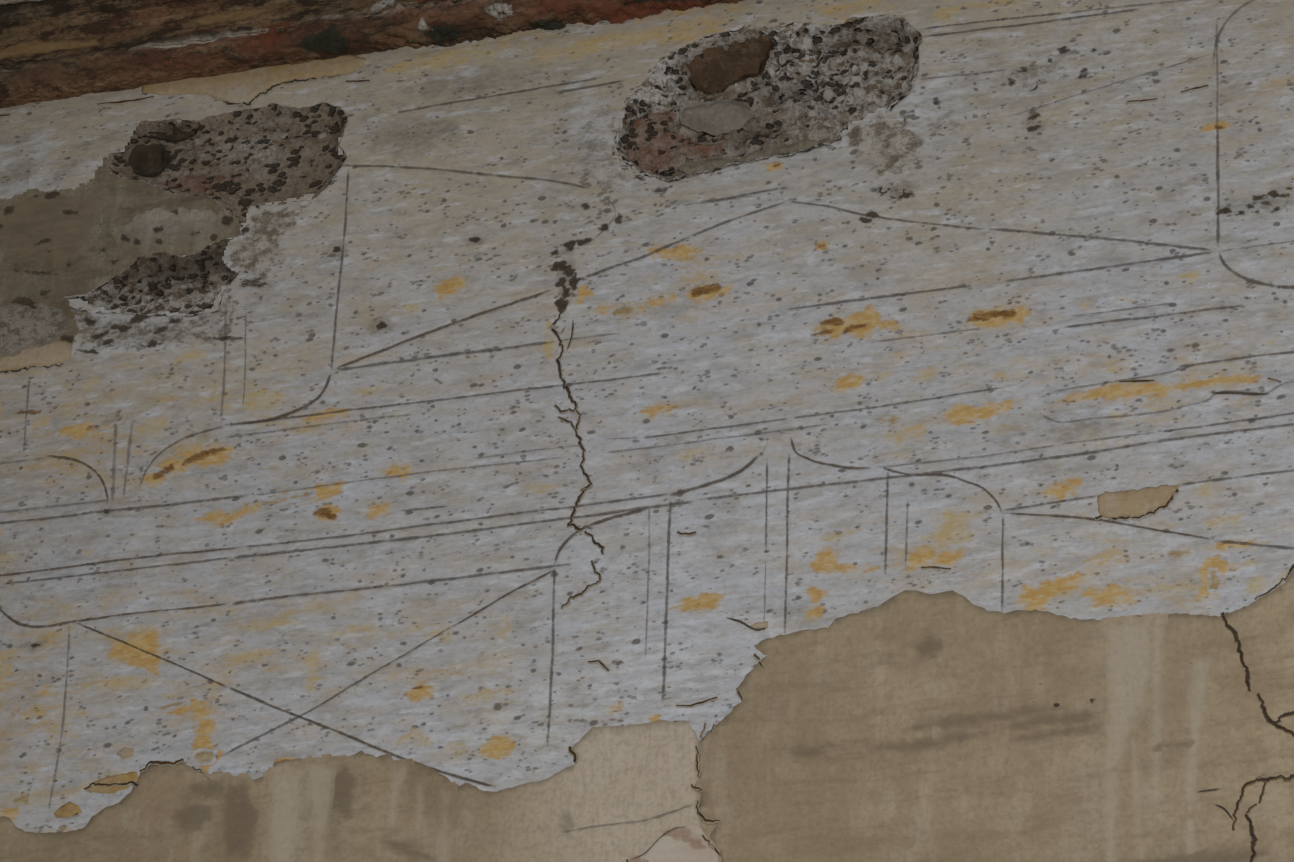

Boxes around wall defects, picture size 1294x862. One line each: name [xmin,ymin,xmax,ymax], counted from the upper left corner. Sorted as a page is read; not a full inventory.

flaking render [0,39,515,376]
flaking render [534,0,1036,372]
crack [550,312,605,609]
flaking render [0,690,231,862]
peeling [101,620,165,675]
peeling [398,615,459,650]
crack [676,653,765,855]
flaking render [415,472,1181,862]
flaking render [1157,532,1294,862]
crack [1200,774,1294,862]
crack [1220,612,1294,737]
crack [1255,564,1294,600]